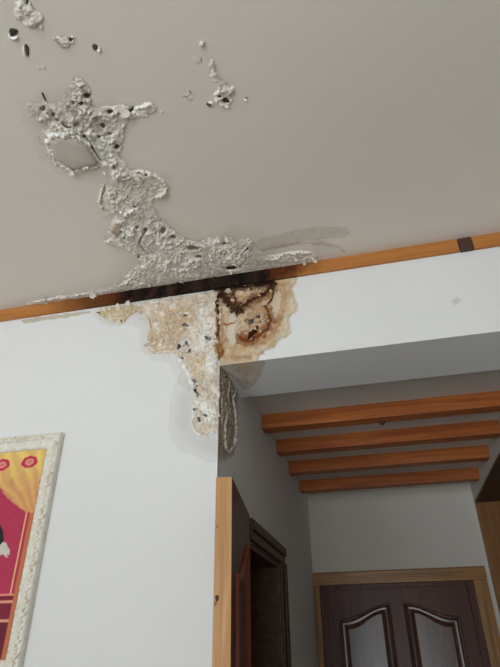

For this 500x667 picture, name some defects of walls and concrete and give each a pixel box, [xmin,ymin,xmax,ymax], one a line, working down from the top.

peeling [13,0,43,28]
peeling [206,59,235,108]
flaking render [23,76,319,306]
water stain [23,264,299,323]
corrosion [219,277,296,365]
flaking render [96,281,278,454]